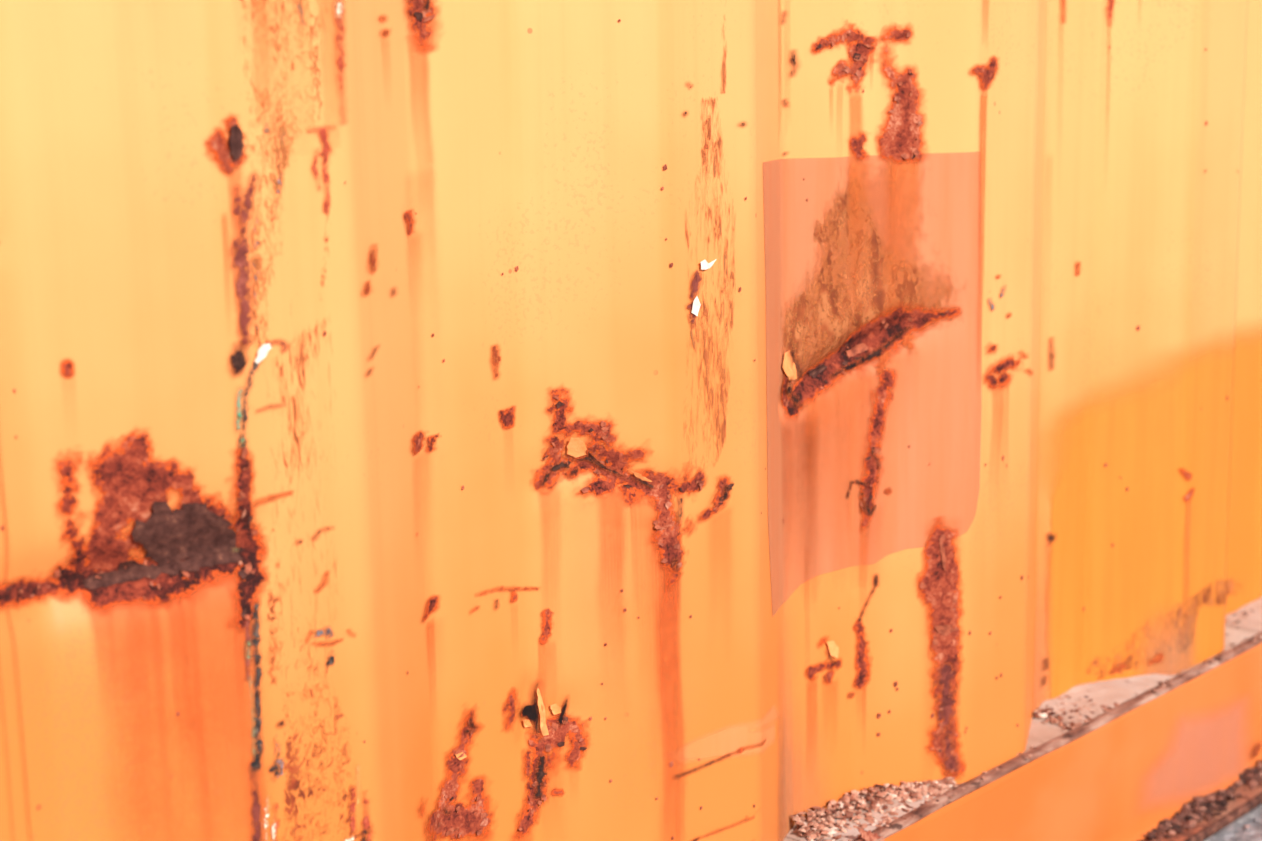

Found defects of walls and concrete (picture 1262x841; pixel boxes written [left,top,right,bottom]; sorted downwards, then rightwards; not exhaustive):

rust [407,0,436,50]
rust [812,24,924,187]
spalling [781,167,961,467]
rust [847,370,896,528]
rust [534,388,735,675]
rust [806,638,842,684]
rust [918,518,971,778]